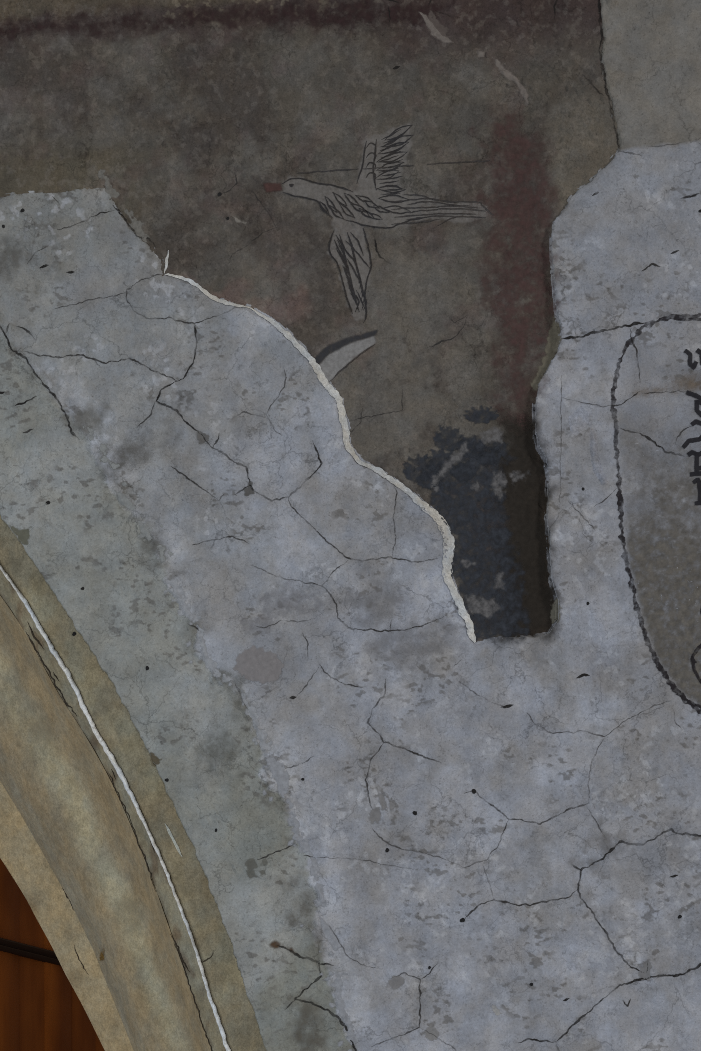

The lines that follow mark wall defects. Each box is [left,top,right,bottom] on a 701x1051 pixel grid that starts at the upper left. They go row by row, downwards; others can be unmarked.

peeling [419,11,452,43]
peeling [478,51,529,105]
crack [0,317,253,495]
spalling [164,250,476,643]
spalling [531,320,561,390]
crack [560,322,691,451]
spalling [11,526,30,545]
crack [276,497,428,632]
spalling [550,597,560,624]
crack [257,620,434,803]
crack [465,705,701,1043]
crack [275,938,438,1051]